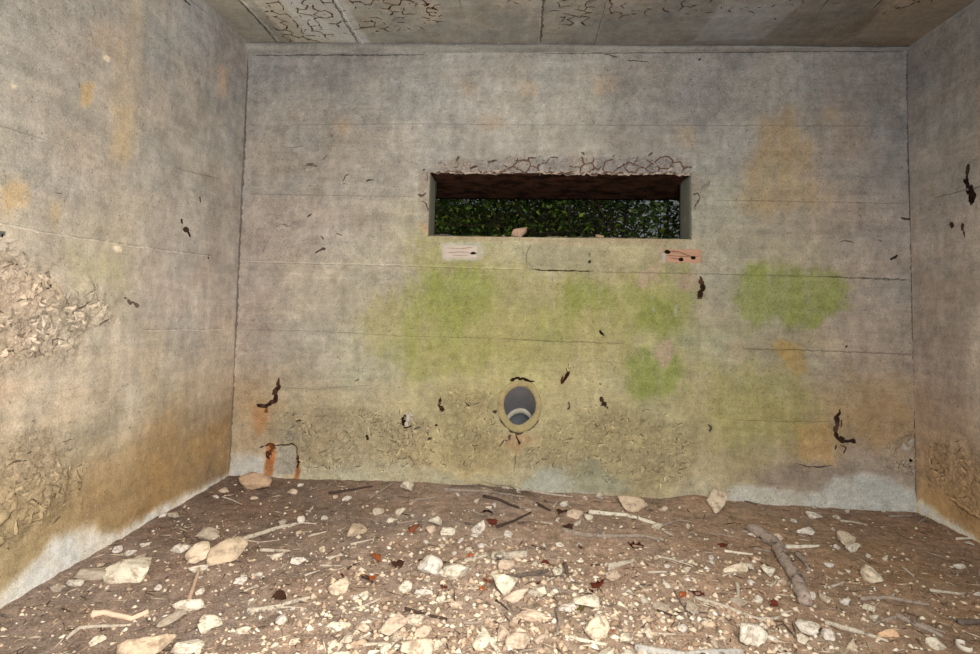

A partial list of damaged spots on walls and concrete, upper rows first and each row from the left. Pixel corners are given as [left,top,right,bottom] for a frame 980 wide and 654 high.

crack [254,0,443,42]
crack [473,0,675,32]
crack [752,0,853,24]
spalling [0,235,140,378]
rust [290,455,303,479]
flaking render [0,420,84,558]